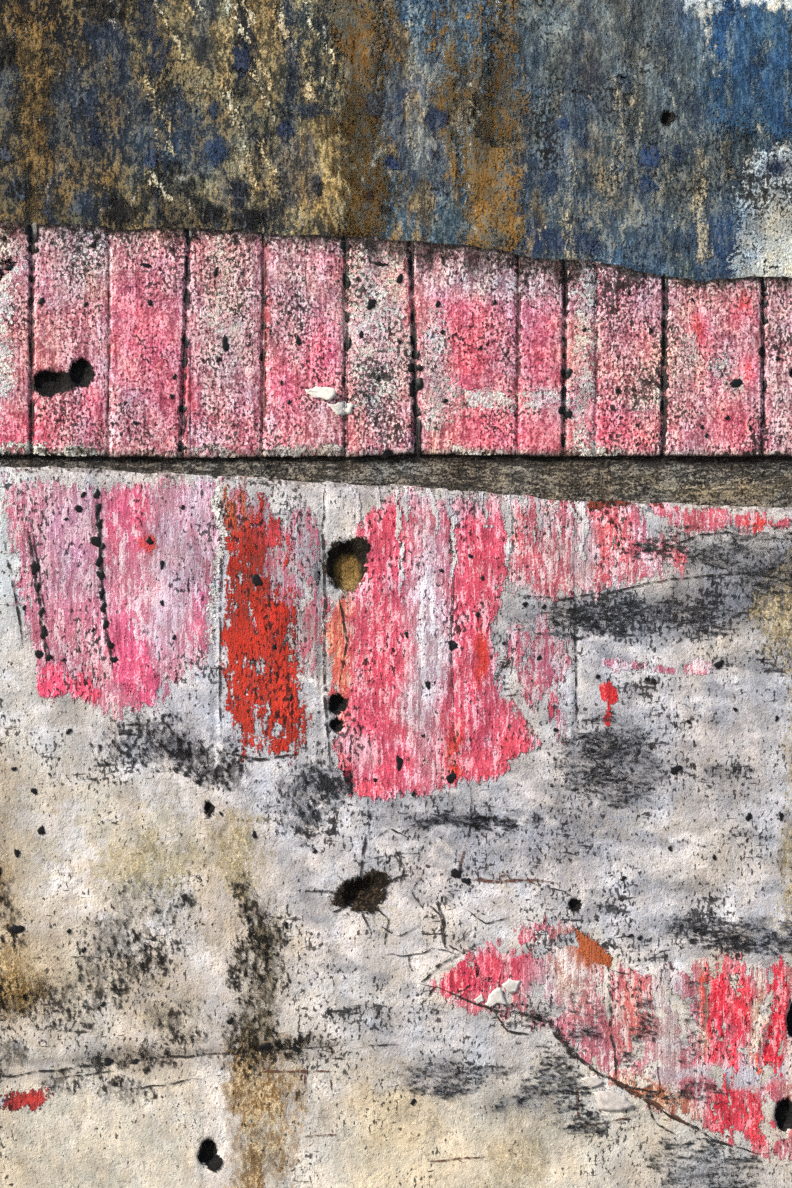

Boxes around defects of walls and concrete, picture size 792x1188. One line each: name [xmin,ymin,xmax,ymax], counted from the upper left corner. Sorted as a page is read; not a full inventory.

damp [0,0,792,304]
damp [216,334,229,362]
peeling [0,469,792,804]
crack [449,516,555,885]
crack [508,570,792,721]
crack [670,532,734,546]
damp [0,761,356,1105]
corrosion [223,1014,307,1188]
crack [431,1155,483,1163]
damp [451,869,471,885]
crack [367,799,774,1154]
peeling [427,916,792,1164]